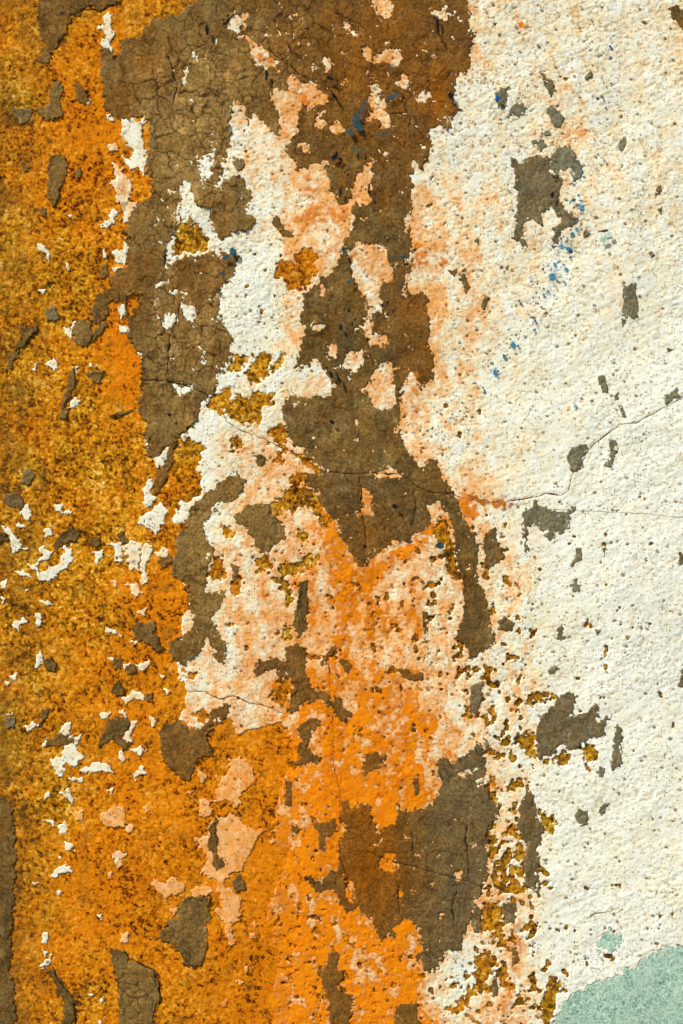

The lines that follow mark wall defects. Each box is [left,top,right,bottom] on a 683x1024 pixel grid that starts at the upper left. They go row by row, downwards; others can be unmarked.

crack [167,54,178,106]
peeling [495,86,528,118]
peeling [509,71,590,250]
rust [110,308,140,417]
crack [141,306,683,553]
flaking render [0,0,520,1024]
rust [459,493,513,518]
peeling [521,500,576,553]
rust [237,504,451,1024]
peeling [297,690,624,973]
peeling [529,944,683,1024]